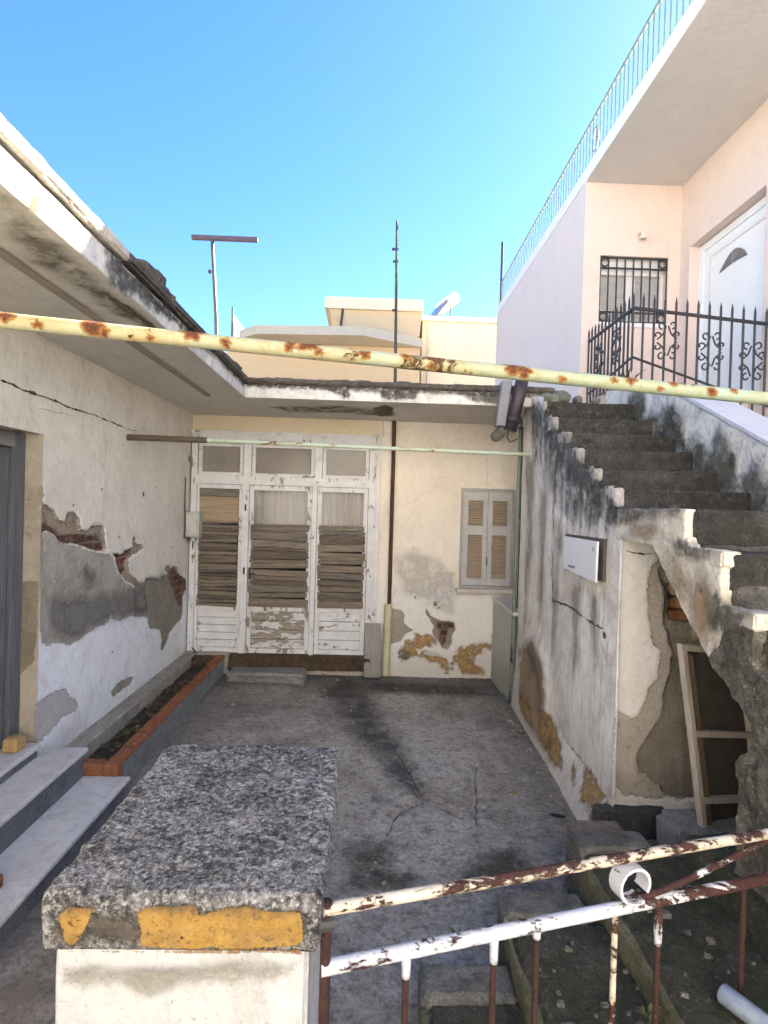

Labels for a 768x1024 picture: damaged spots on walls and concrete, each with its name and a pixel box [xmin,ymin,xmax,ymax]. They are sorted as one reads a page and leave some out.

water stain [20,235,189,331]
crack [1,379,135,431]
water stain [225,364,683,591]
peeling [20,486,186,674]
peeling [391,608,413,644]
flaking render [425,601,455,650]
crack [551,502,606,639]
water stain [668,540,744,634]
peeling [34,689,78,742]
flaking render [614,558,701,799]
crack [381,730,478,840]
peeling [54,904,304,955]